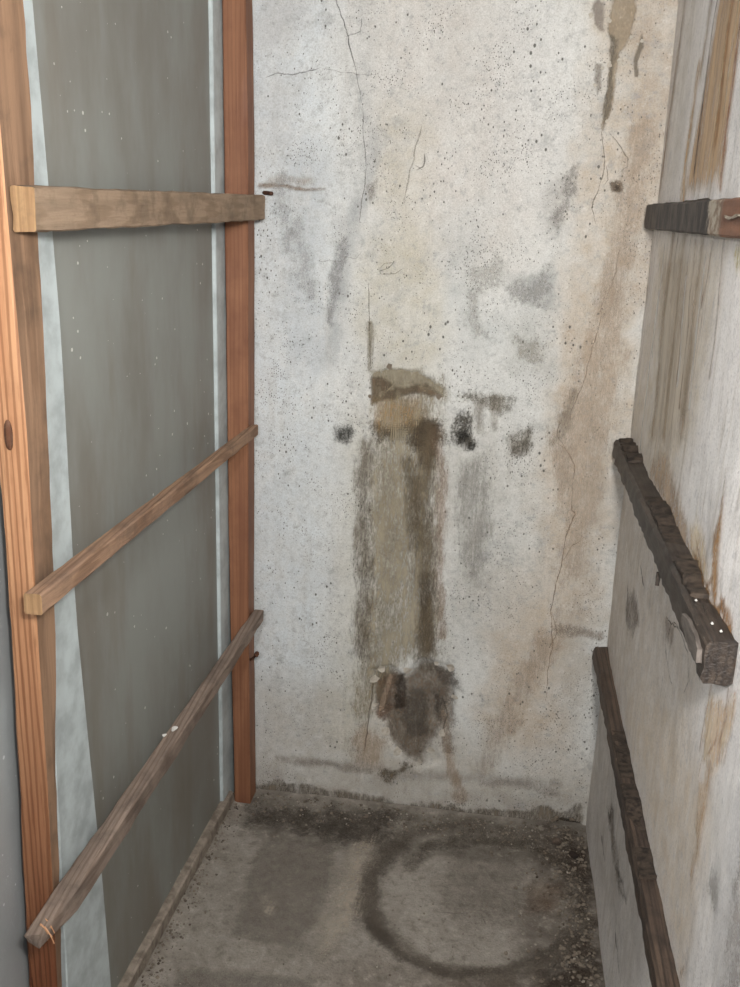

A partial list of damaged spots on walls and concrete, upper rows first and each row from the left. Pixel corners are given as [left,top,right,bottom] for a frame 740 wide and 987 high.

rust [682,0,740,201]
leakage [334,427,353,444]
leakage [462,394,510,412]
leakage [511,429,533,457]
leakage [354,378,475,718]
rust [694,503,732,633]
leakage [380,762,412,782]
leakage [246,780,603,987]